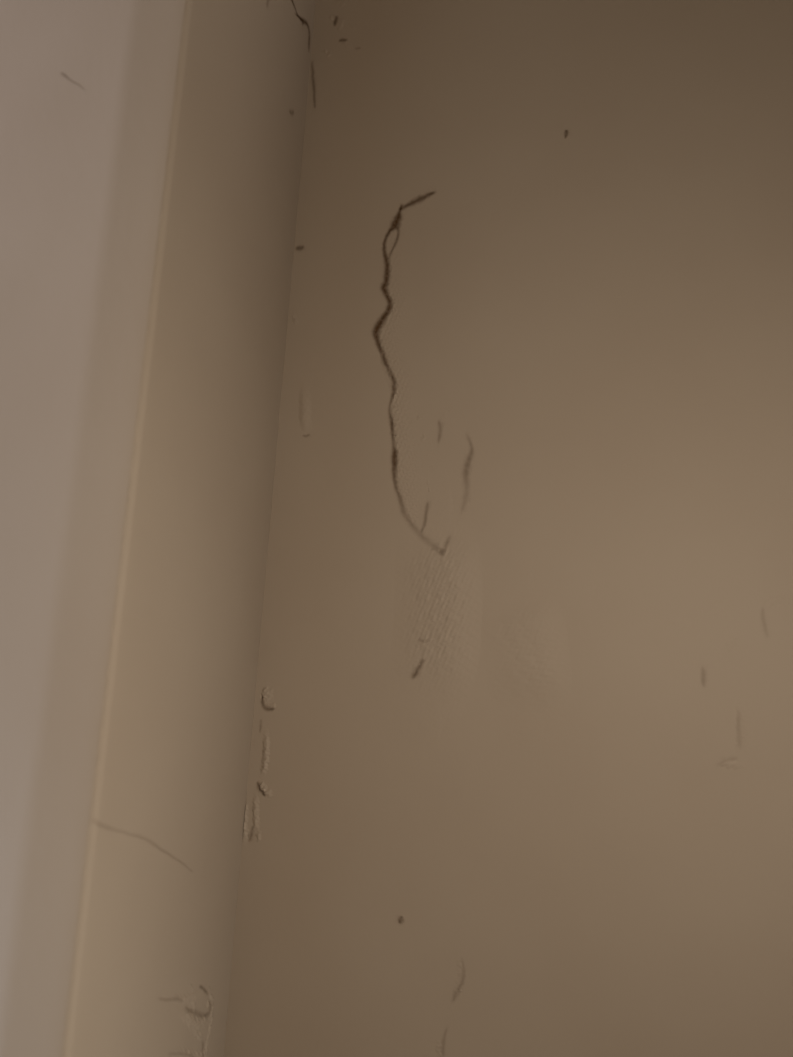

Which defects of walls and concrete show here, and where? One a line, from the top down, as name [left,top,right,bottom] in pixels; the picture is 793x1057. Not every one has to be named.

crack [374,184,454,525]